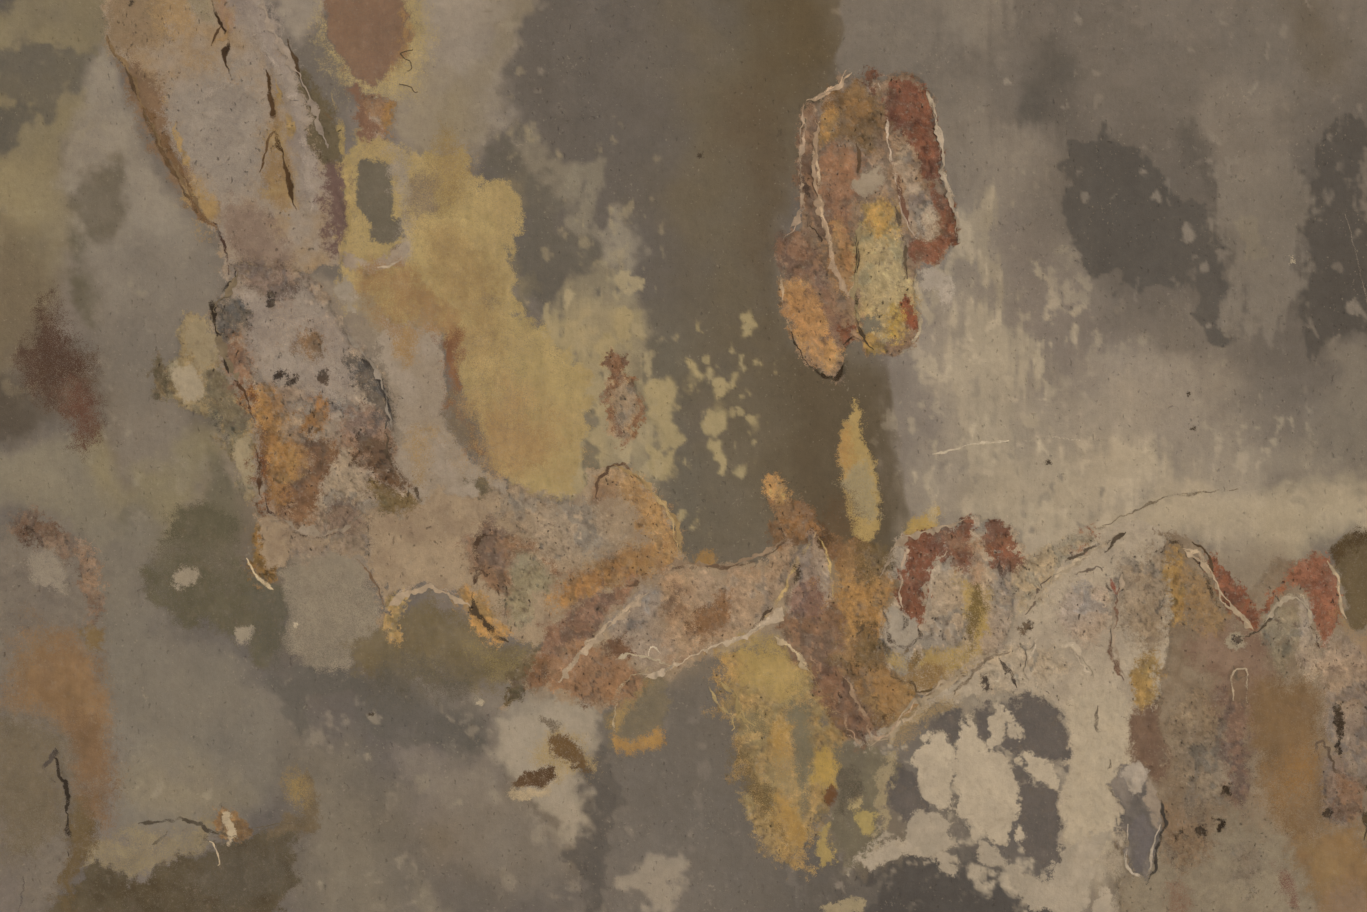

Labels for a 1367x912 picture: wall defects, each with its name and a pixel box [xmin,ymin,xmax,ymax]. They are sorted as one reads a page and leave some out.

flaking render [350,91,399,149]
flaking render [769,65,962,387]
leakage [327,119,598,501]
flaking render [599,347,647,450]
leakage [1325,521,1367,634]
crack [42,748,72,856]
peeling [209,806,254,866]
peeling [905,808,960,878]
peeling [908,699,1026,847]
peeling [819,896,867,912]